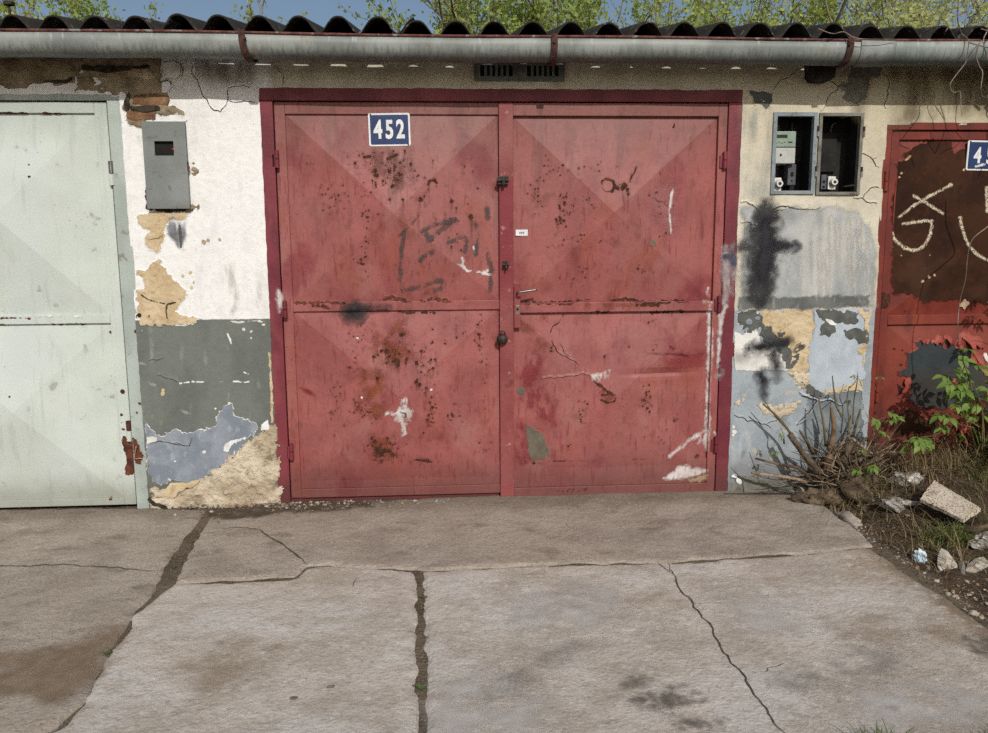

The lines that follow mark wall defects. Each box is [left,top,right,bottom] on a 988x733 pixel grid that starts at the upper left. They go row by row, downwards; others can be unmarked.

spalling [0,57,187,129]
crack [180,61,256,112]
corrosion [347,150,438,201]
corrosion [597,164,637,196]
peeling [135,187,202,328]
corrosion [120,413,144,475]
spalling [144,352,284,509]
corrosion [329,314,487,434]
peeling [728,307,872,492]
crack [0,563,159,571]
crack [220,527,309,565]
crack [658,563,785,733]